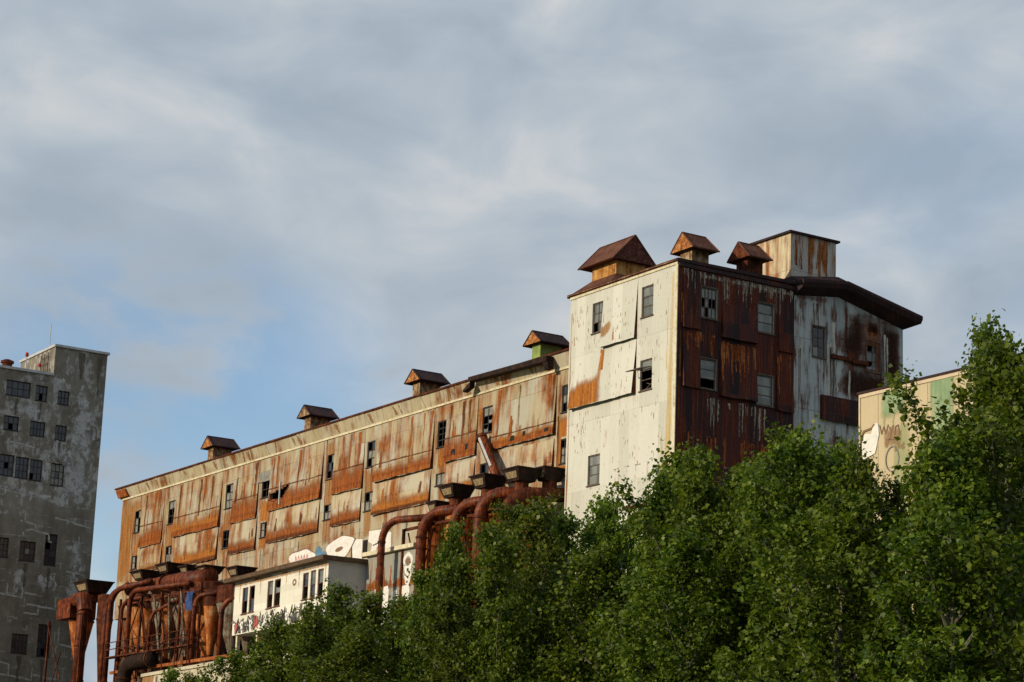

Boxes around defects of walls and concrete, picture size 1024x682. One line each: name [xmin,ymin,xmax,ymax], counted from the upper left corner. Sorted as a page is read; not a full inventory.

corrosion [795,240,825,273]
corrosion [679,292,756,382]
leakage [828,322,851,400]
corrosion [490,349,604,508]
corrosion [707,398,771,471]
corrosion [117,384,476,582]
corrosion [366,566,413,591]